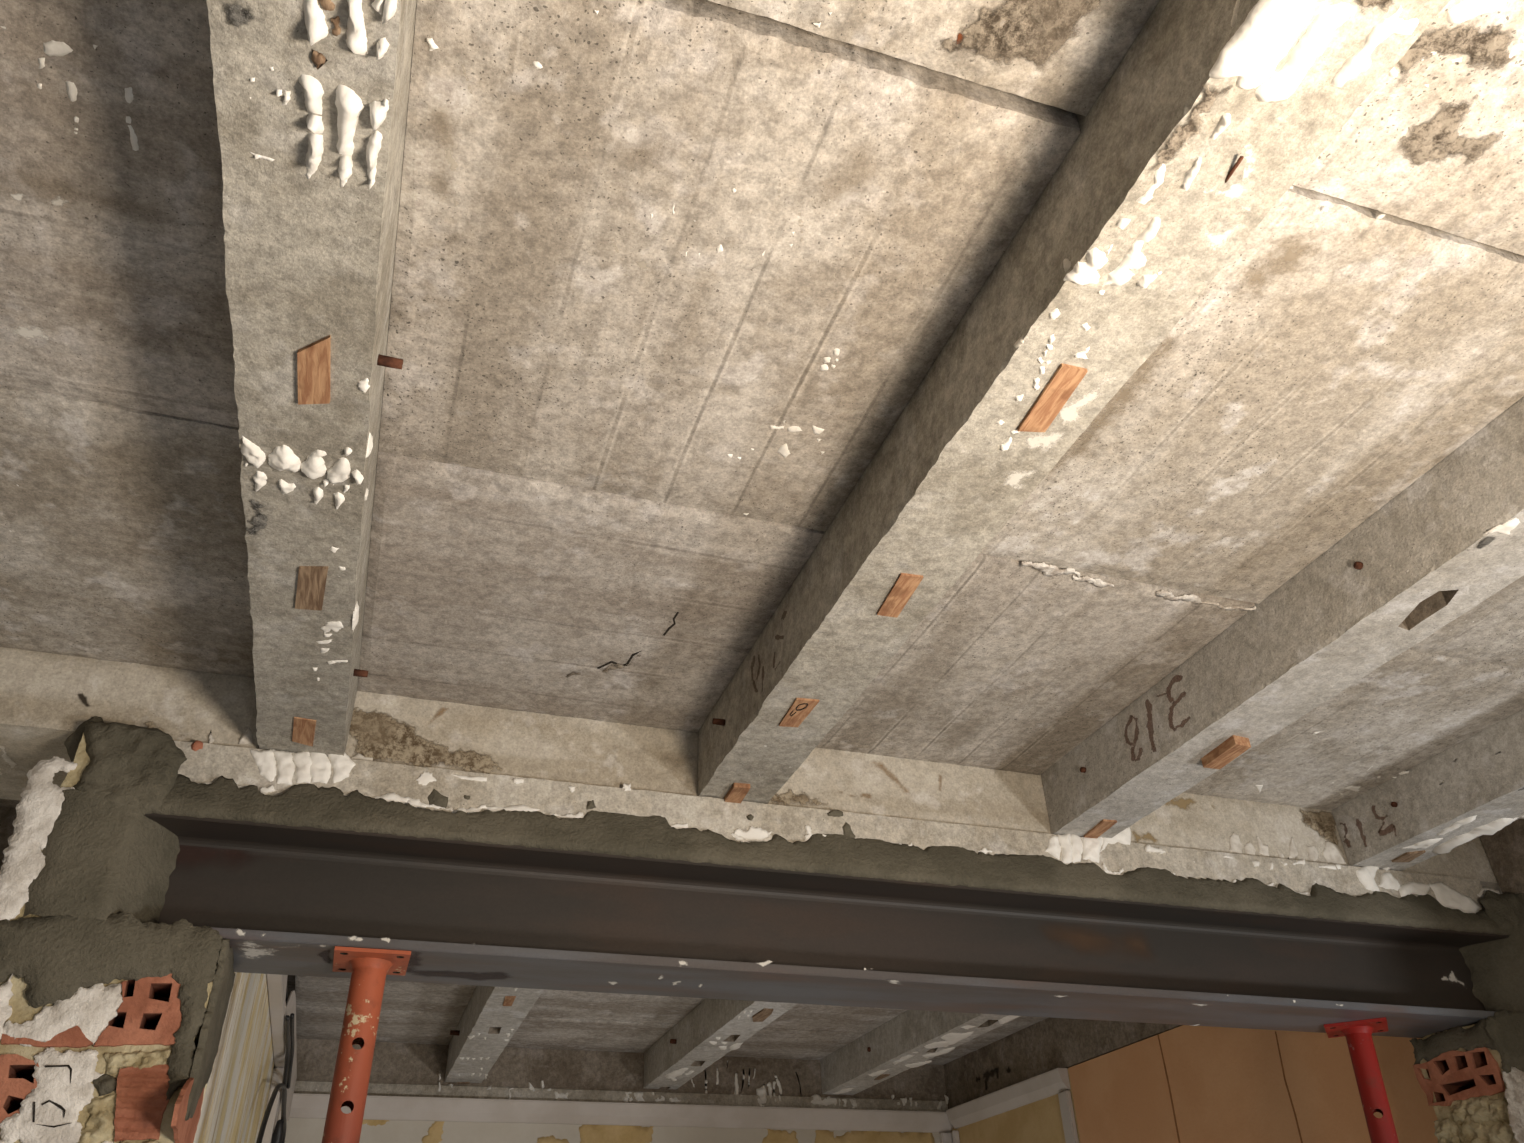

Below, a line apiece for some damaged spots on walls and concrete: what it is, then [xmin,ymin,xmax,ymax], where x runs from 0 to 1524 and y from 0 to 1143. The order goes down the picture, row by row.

spalling [1360,0,1393,11]
spalling [942,0,1101,66]
spalling [1398,25,1515,82]
spalling [1401,95,1504,165]
crack [597,612,679,669]
spalling [344,708,584,818]
peeling [237,785,278,795]
spalling [771,790,823,805]
peeling [731,826,771,841]
spalling [1300,810,1338,845]
peeling [537,1125,654,1143]
peeling [762,1129,935,1143]